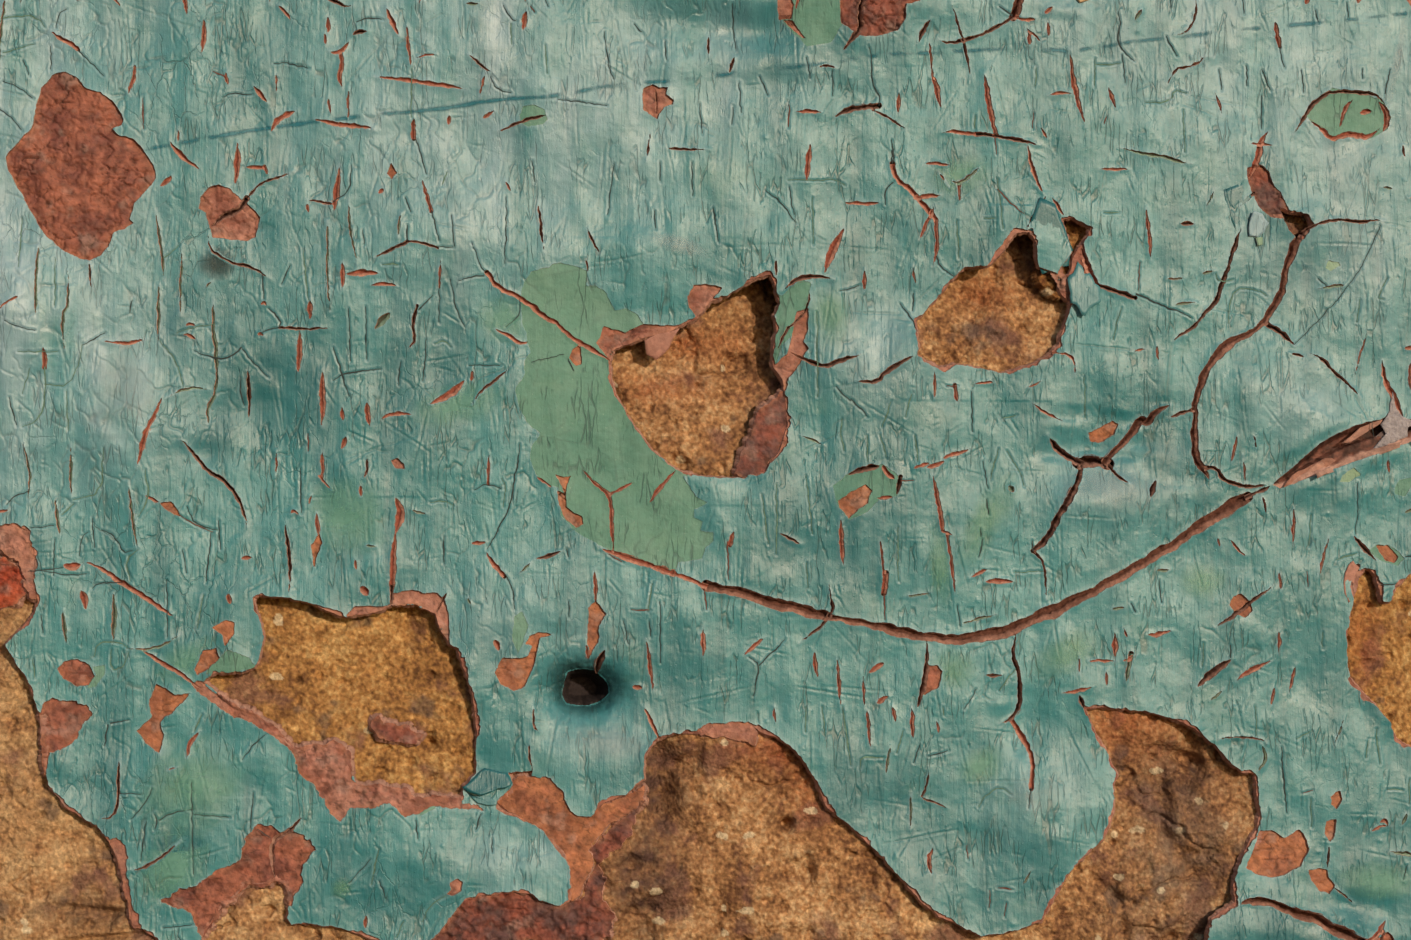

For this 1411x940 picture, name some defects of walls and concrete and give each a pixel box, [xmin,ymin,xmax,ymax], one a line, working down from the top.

peeling [6,72,156,267]
crack [660,165,719,241]
crack [700,76,790,133]
peeling [777,0,919,46]
spalling [914,197,1101,374]
crack [806,0,1391,276]
peeling [515,263,811,575]
crack [584,179,1401,822]
spalling [0,524,158,940]
spalling [138,591,1334,940]
spalling [1344,545,1411,747]
crack [1366,728,1410,804]